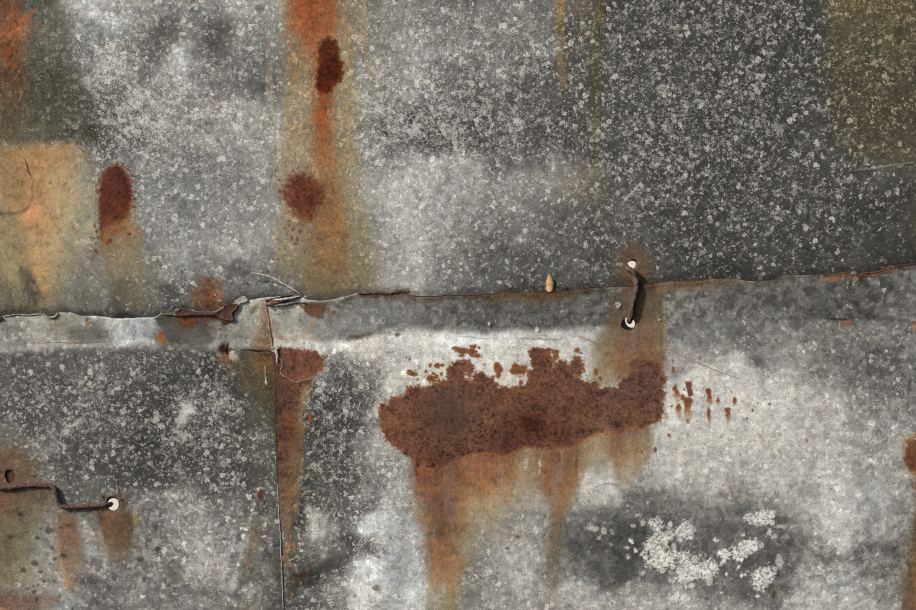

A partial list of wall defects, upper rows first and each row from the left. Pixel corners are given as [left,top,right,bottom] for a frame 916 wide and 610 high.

rust [275,0,350,285]
rust [93,153,138,256]
rust [296,288,603,327]
rust [244,305,331,580]
rust [377,249,757,609]
rust [902,433,916,473]
rust [0,448,82,610]
rust [96,496,134,560]
rust [900,514,916,610]